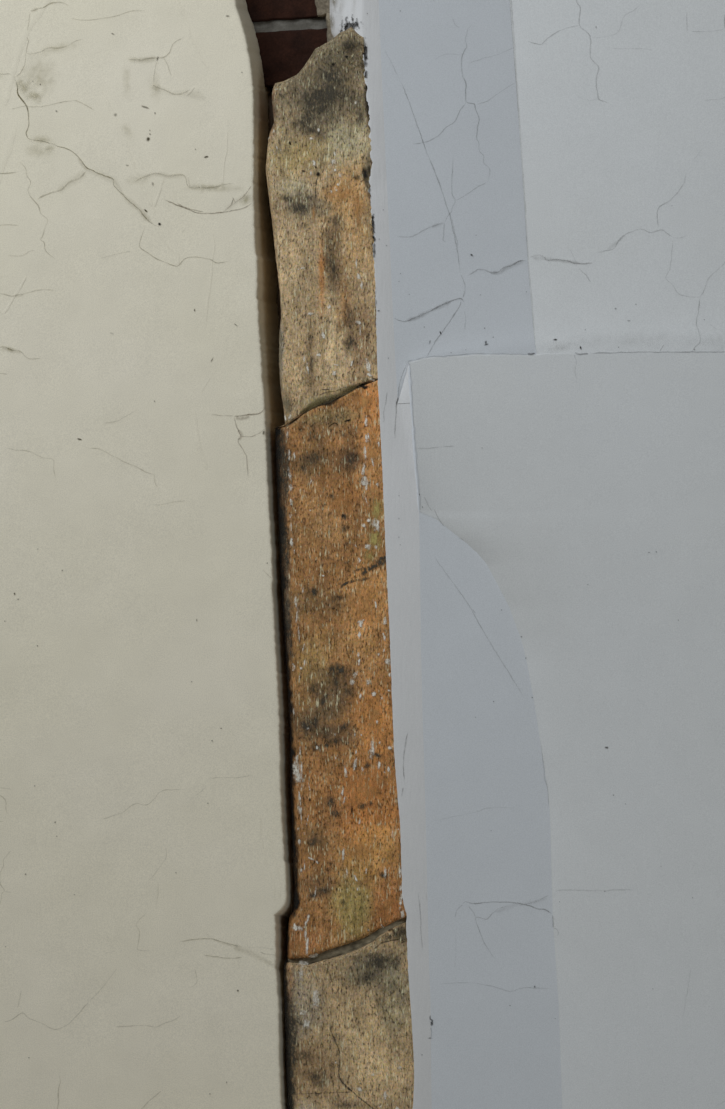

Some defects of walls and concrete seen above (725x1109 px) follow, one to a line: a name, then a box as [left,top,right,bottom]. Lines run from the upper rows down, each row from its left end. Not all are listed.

peeling [293,750,311,821]
peeling [293,915,318,975]